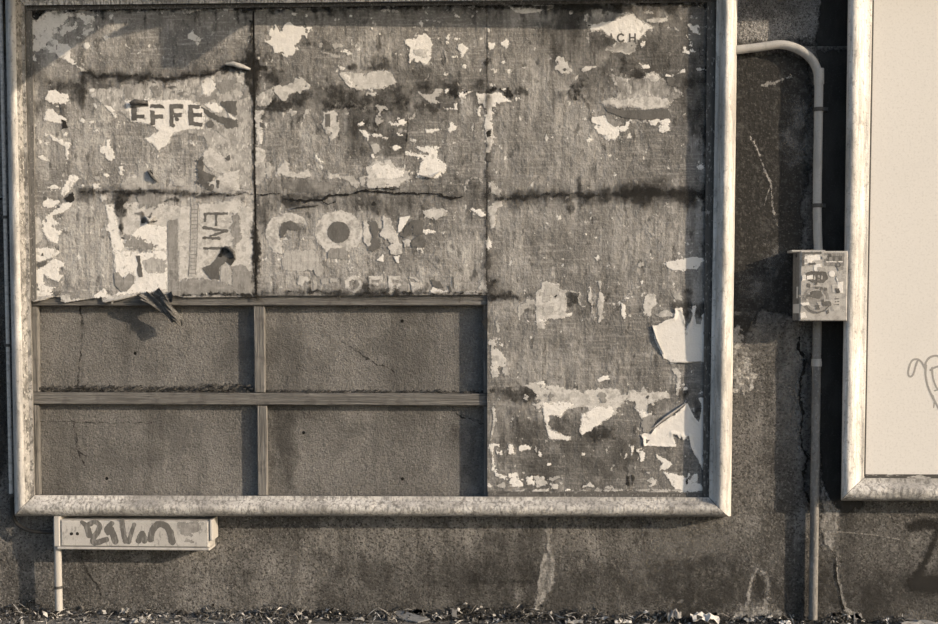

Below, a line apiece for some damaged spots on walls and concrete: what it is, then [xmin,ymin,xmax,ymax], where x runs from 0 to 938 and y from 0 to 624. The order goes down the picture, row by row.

water stain [796,0,848,251]
crack [796,336,810,503]
water stain [819,321,863,551]